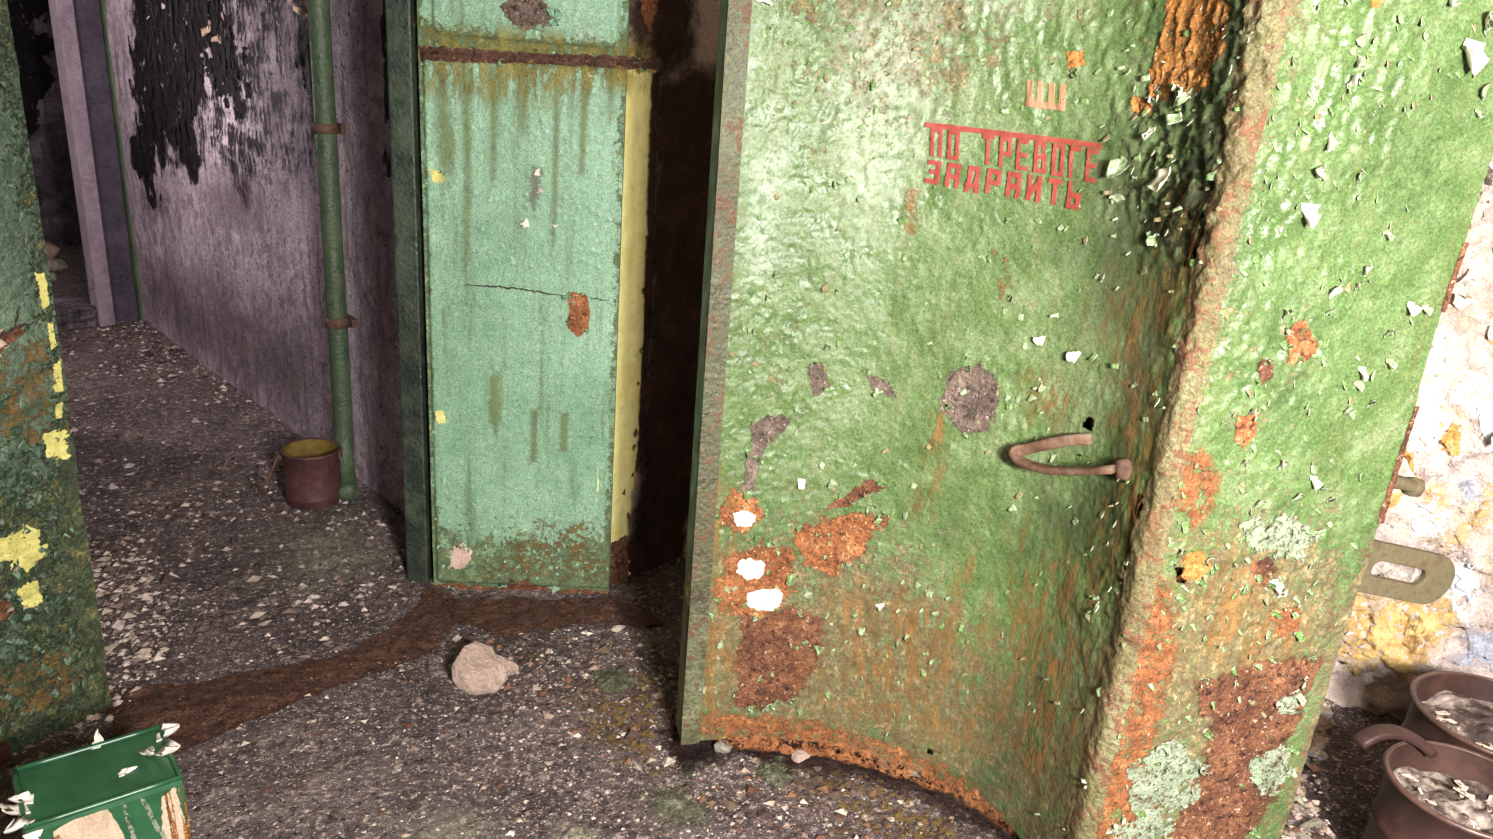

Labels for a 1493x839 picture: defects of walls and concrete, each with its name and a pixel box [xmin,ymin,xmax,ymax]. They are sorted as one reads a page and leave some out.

corrosion [1131,0,1235,115]
corrosion [0,324,25,357]
spalling [1389,185,1493,538]
corrosion [434,519,664,642]
corrosion [700,414,1013,839]
corrosion [1088,448,1458,839]
peeling [0,681,36,734]
corrosion [567,673,672,776]